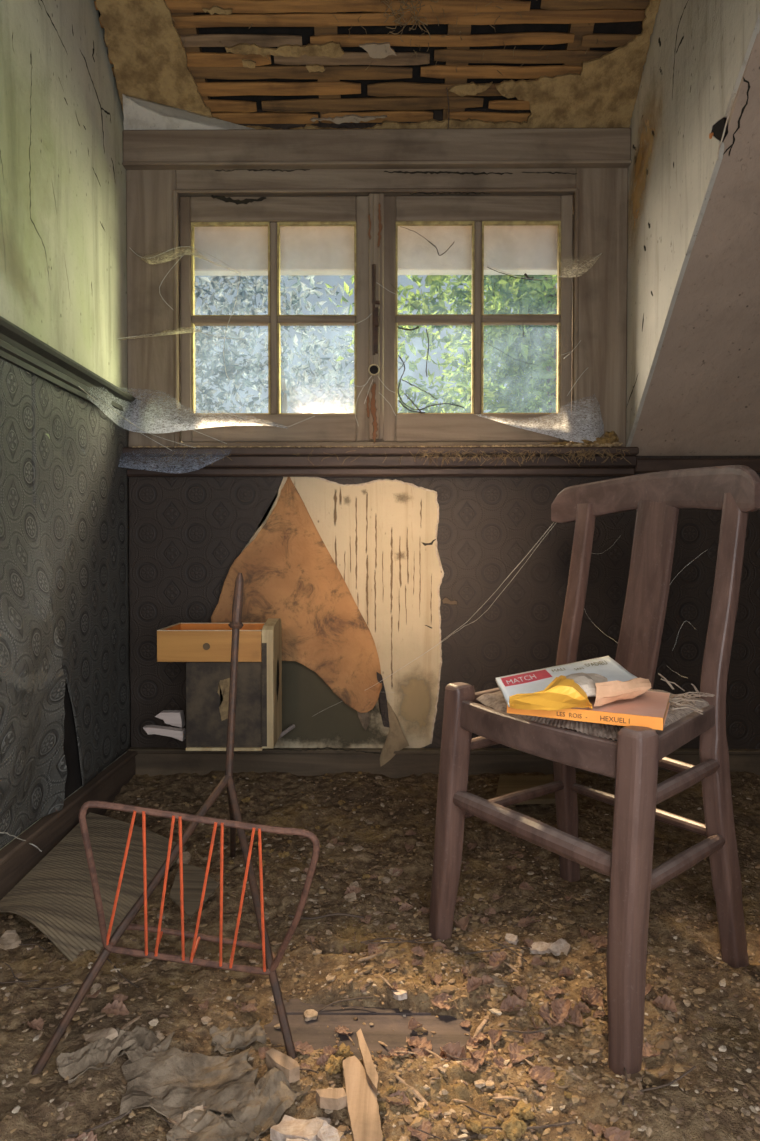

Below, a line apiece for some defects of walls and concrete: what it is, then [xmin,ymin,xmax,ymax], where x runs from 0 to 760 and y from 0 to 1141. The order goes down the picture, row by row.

crack [0,34,92,306]
crack [38,0,115,184]
spalling [94,0,661,130]
crack [723,77,750,156]